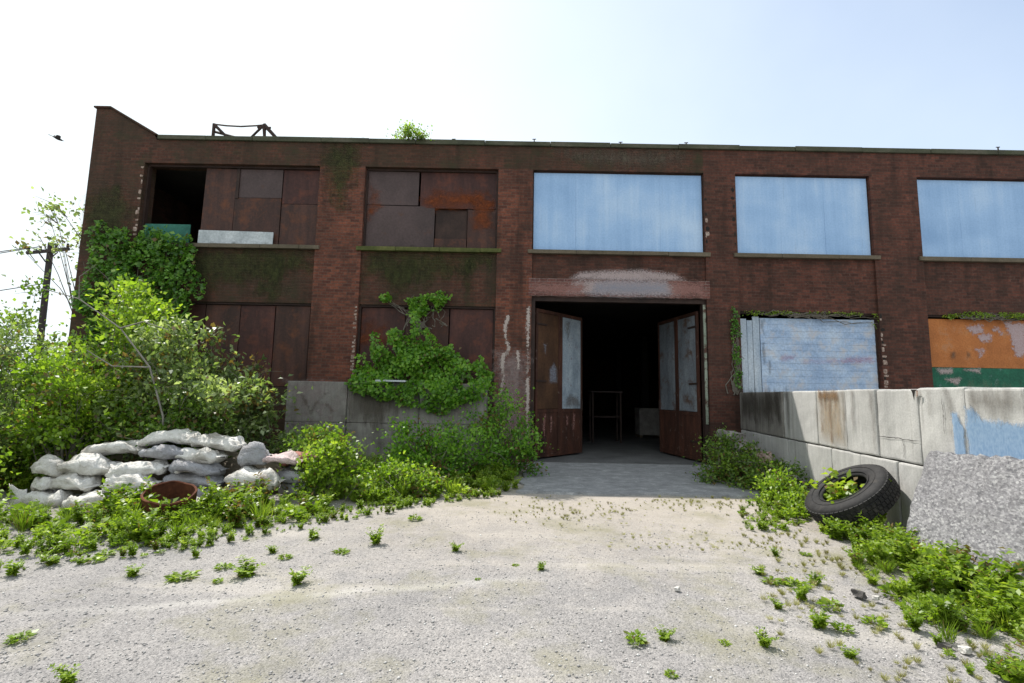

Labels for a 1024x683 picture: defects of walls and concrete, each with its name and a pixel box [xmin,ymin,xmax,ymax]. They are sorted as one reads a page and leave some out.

peeling [532,270,708,298]
water stain [500,315,520,393]
peeling [939,322,1024,384]
peeling [952,413,966,454]